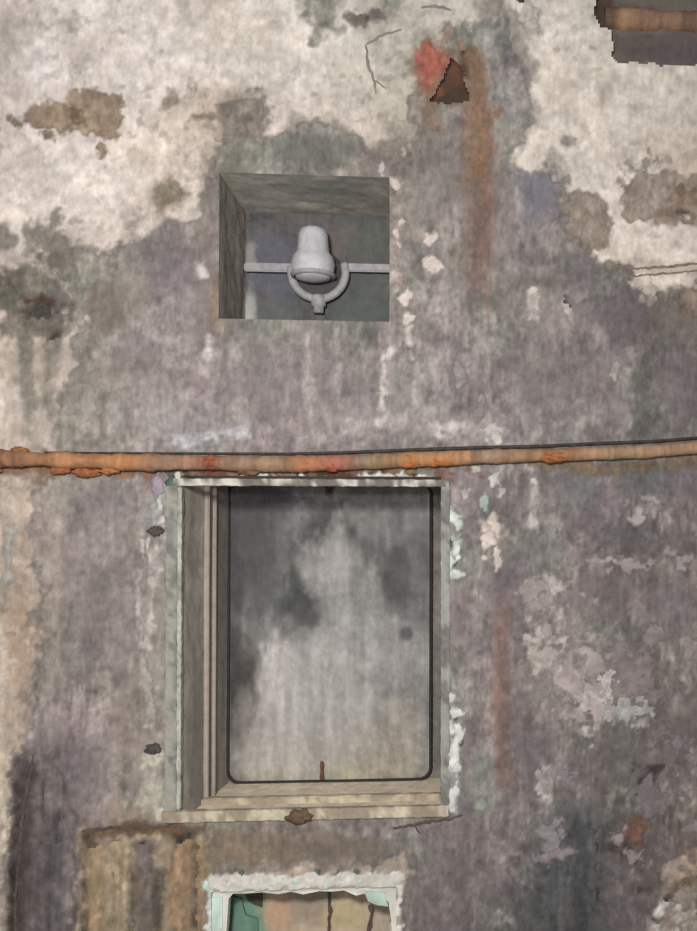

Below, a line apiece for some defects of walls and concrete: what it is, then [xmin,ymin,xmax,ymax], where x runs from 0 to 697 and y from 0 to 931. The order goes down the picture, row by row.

peeling [55,0,697,457]
rust [0,454,309,480]
rust [322,455,454,478]
rust [529,448,696,475]
peeling [21,454,697,931]
peeling [0,840,14,931]
leakage [0,750,80,931]